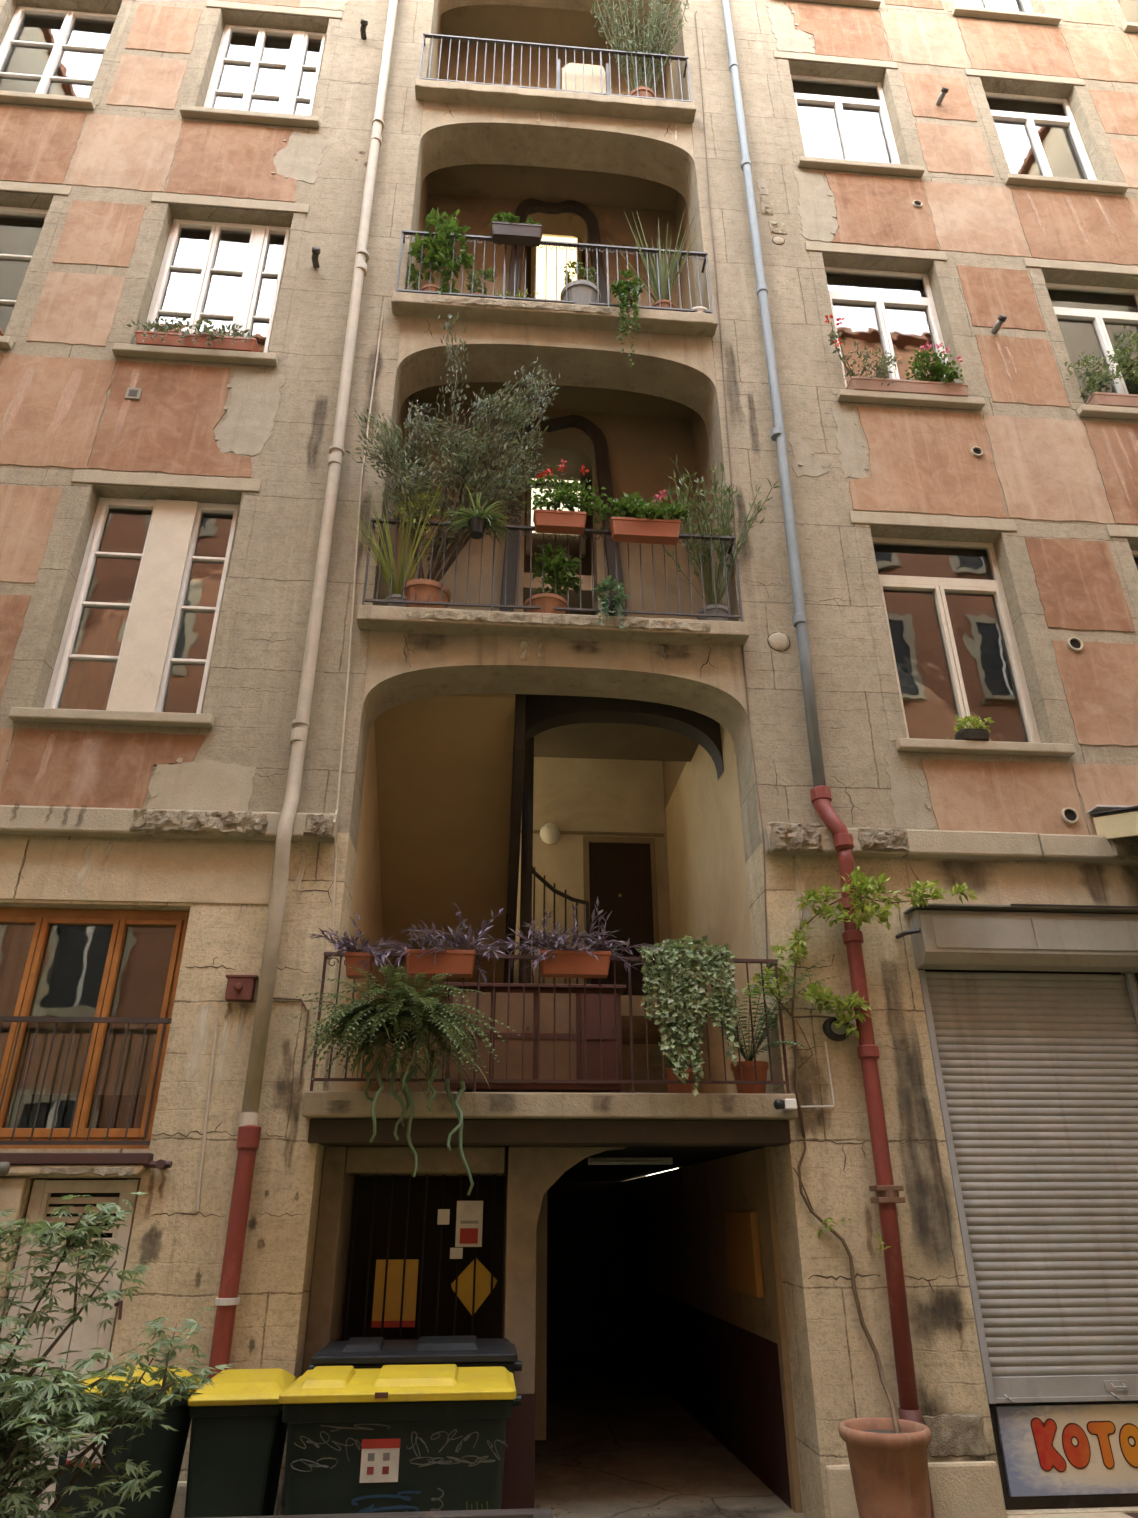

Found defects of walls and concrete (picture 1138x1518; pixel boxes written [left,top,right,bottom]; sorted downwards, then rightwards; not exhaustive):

flaking render [760,170,838,243]
flaking render [214,369,285,456]
water stain [887,991,937,1195]
crack [797,1139,939,1174]
crack [808,1273,965,1292]